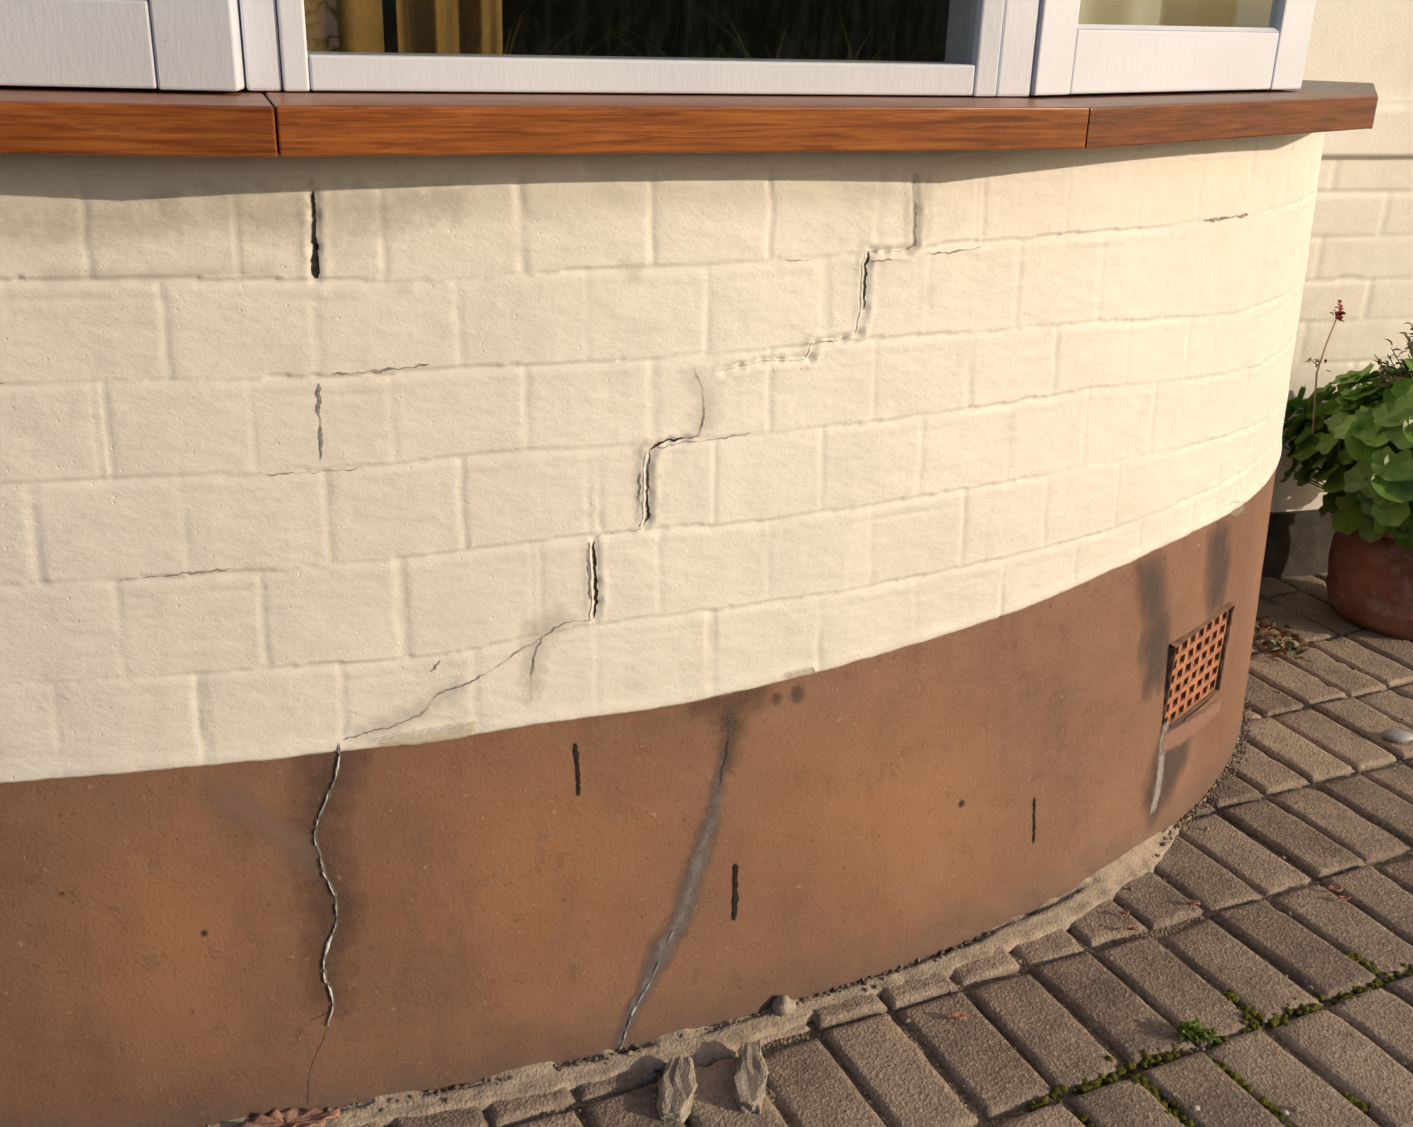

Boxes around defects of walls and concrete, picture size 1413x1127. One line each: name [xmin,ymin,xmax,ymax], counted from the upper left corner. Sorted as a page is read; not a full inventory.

crack [267,364,430,476]
crack [292,180,980,1100]